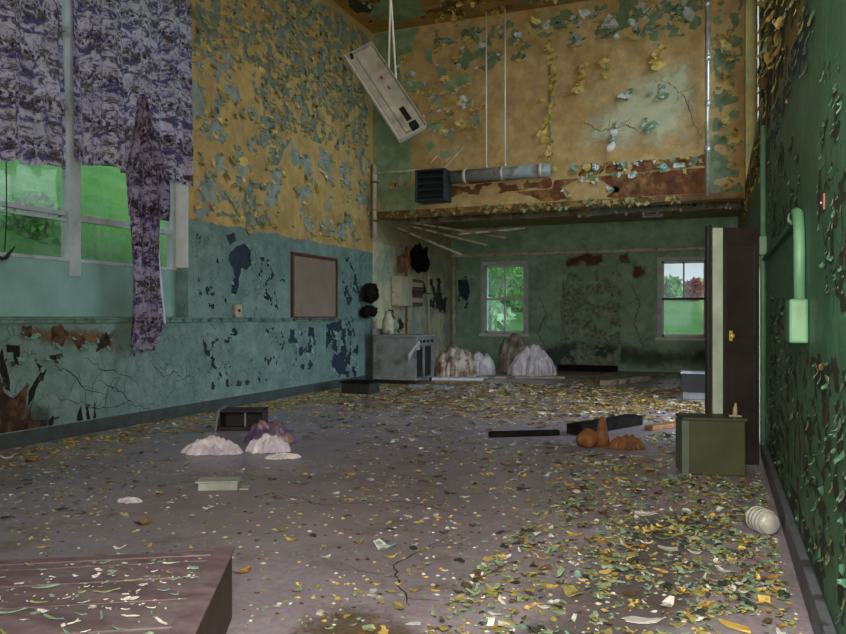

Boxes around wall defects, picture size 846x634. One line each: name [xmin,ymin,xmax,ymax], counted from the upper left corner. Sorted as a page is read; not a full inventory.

peeling [192,0,815,243]
peeling [815,61,846,317]
peeling [198,232,285,311]
peeling [342,257,361,307]
spalling [0,378,60,434]
spalling [11,324,112,381]
crack [54,340,146,410]
peeling [203,316,359,390]
peeling [767,293,846,631]
crack [351,536,449,606]